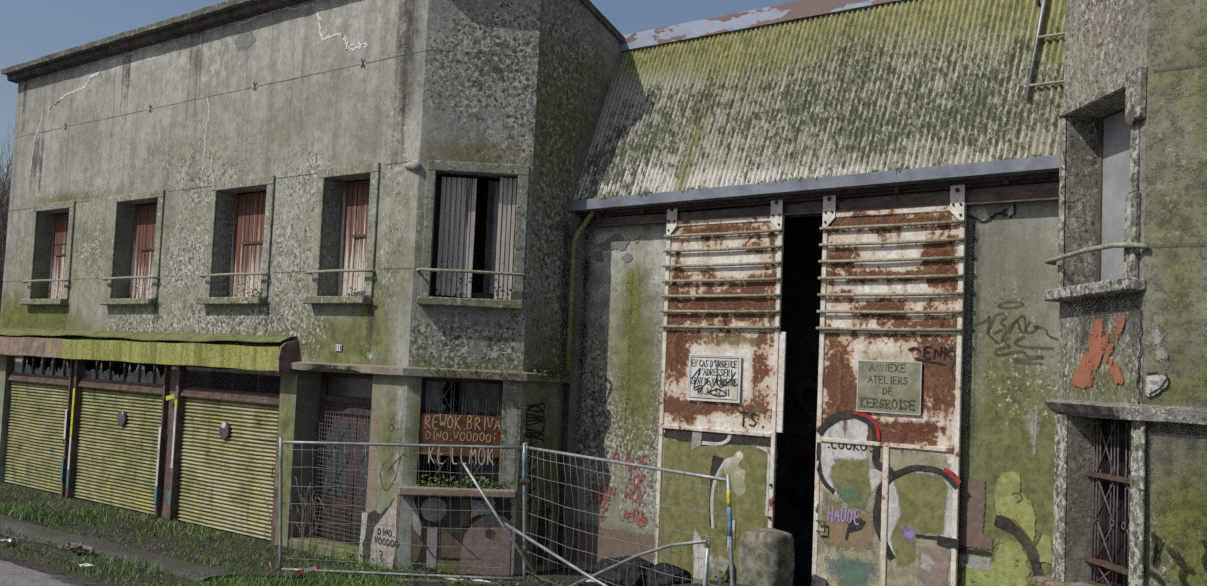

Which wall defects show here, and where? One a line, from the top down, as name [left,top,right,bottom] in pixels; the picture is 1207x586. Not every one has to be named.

crack [237,0,368,53]
crack [30,44,161,172]
corrosion [674,224,737,244]
corrosion [767,232,777,275]
corrosion [827,251,872,286]
corrosion [875,212,944,241]
corrosion [886,234,958,292]
corrosion [667,248,775,375]
corrosion [860,301,892,328]
corrosion [672,405,703,425]
corrosion [830,339,851,432]
corrosion [875,371,950,451]